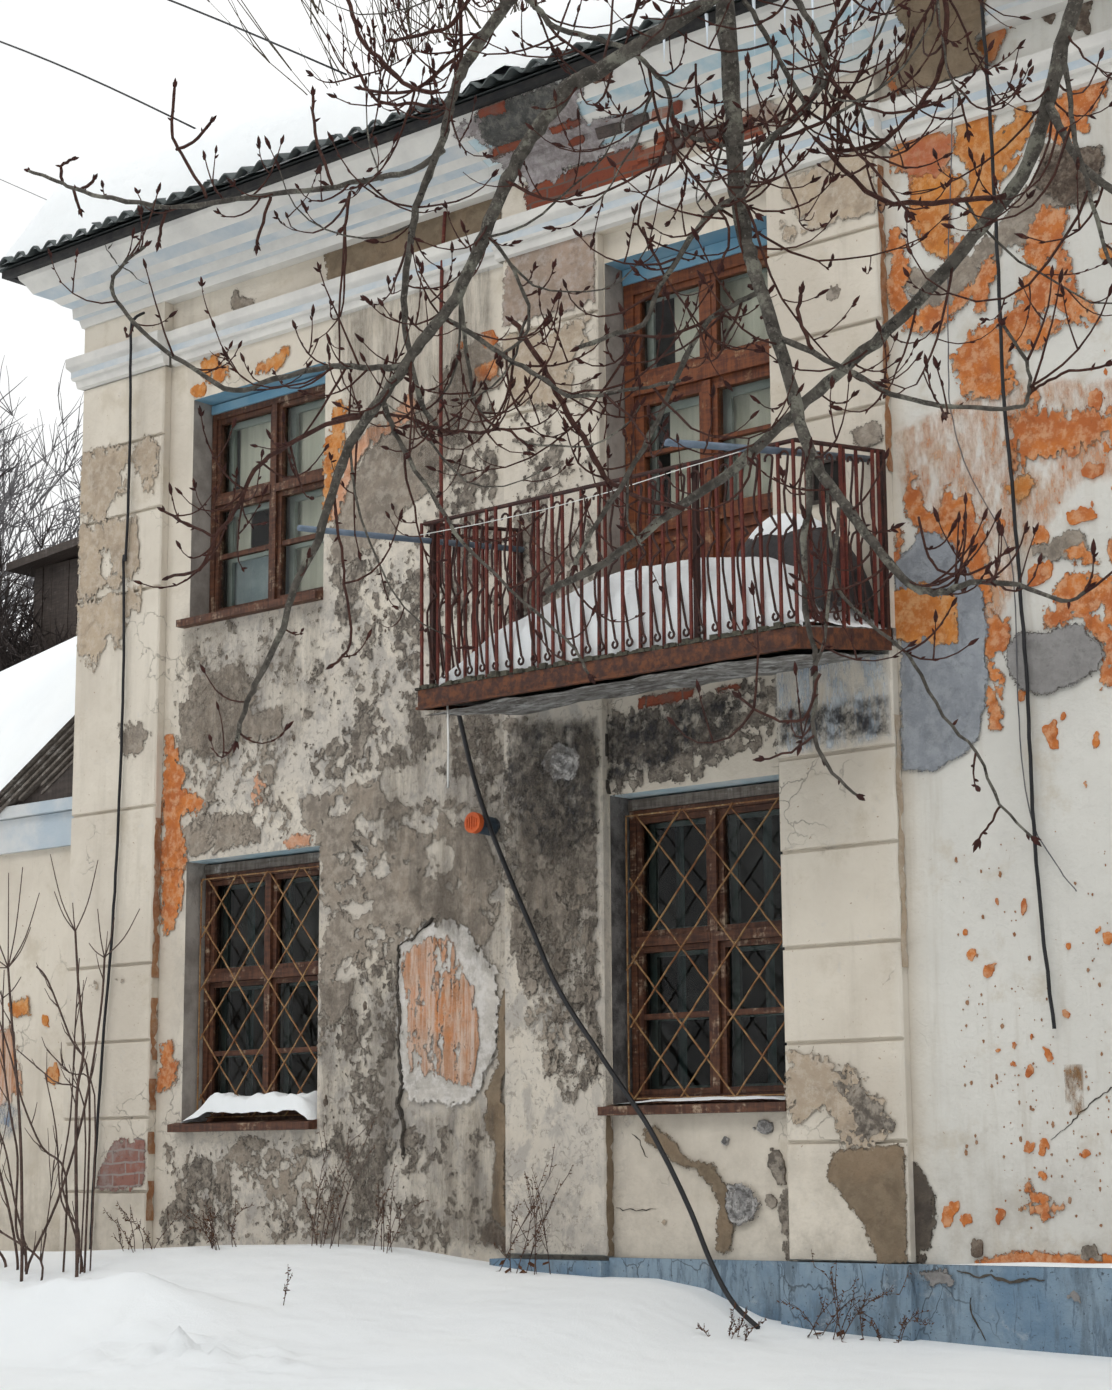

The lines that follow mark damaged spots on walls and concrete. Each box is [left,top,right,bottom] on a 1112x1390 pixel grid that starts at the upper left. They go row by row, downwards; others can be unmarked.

flaking render [474,79,725,210]
peeling [779,80,1112,505]
peeling [76,434,160,673]
peeling [1042,712,1066,749]
peeling [1092,731,1100,749]
flaking render [160,617,603,1097]
peeling [995,898,1027,937]
peeling [155,1039,180,1093]
flaking render [606,1115,614,1256]
flaking render [784,1042,1112,1287]
peeling [957,922,1112,1229]
crack [1051,1087,1112,1140]